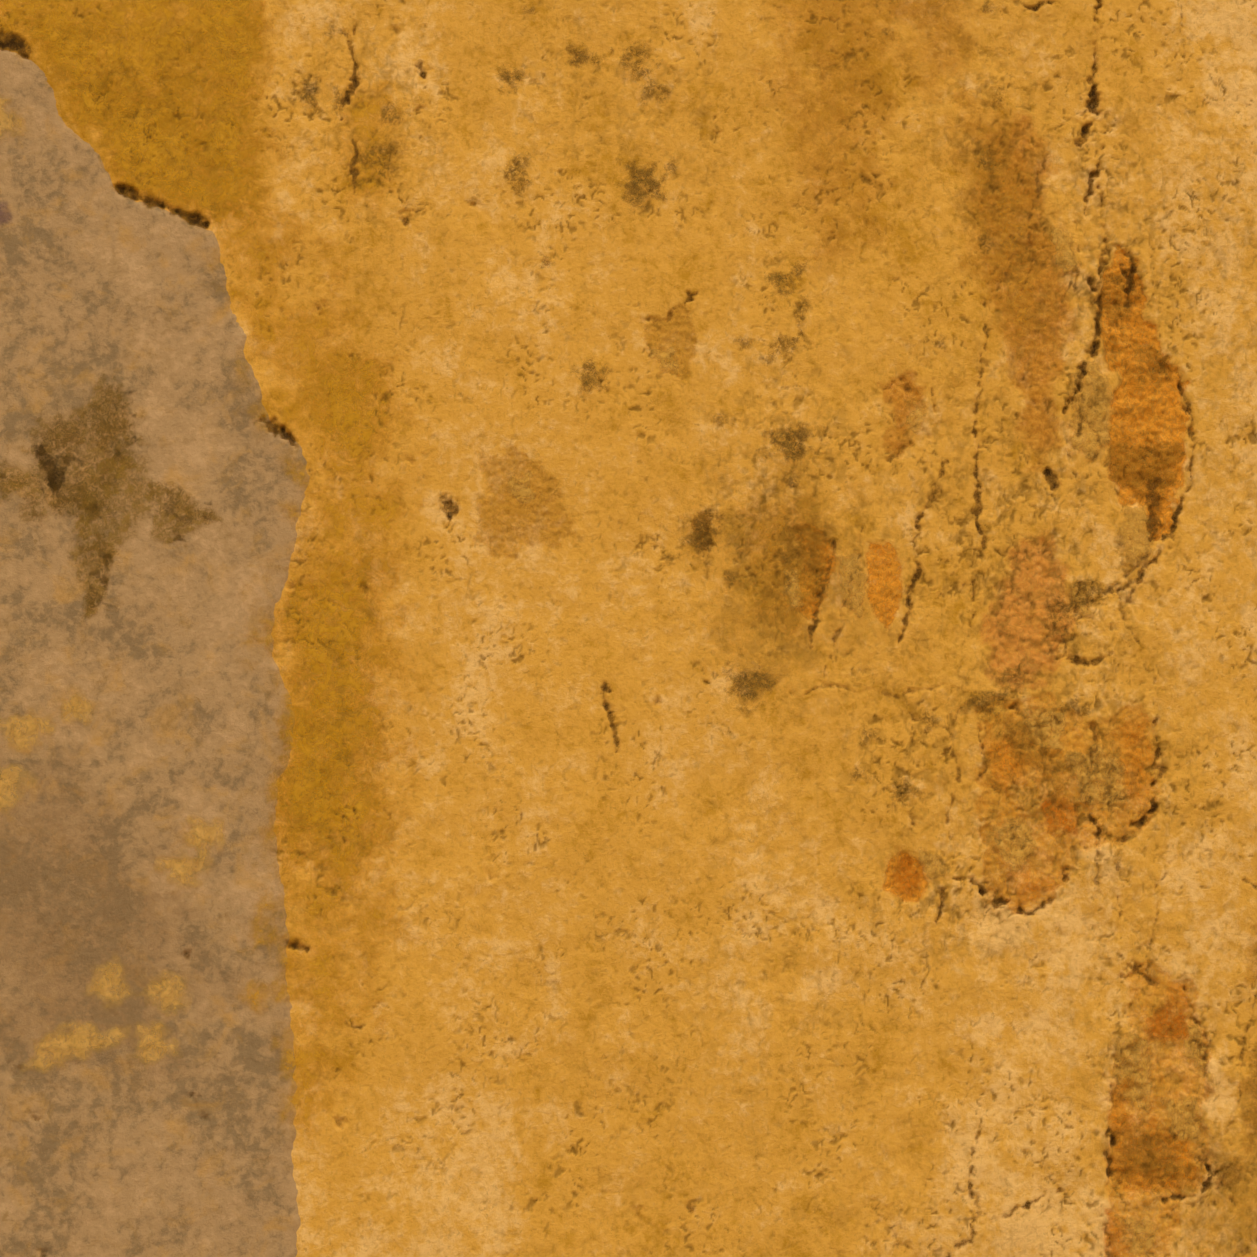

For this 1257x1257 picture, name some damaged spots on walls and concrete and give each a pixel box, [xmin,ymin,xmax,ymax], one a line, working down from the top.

crack [1076,53,1102,202]
crack [1063,239,1136,436]